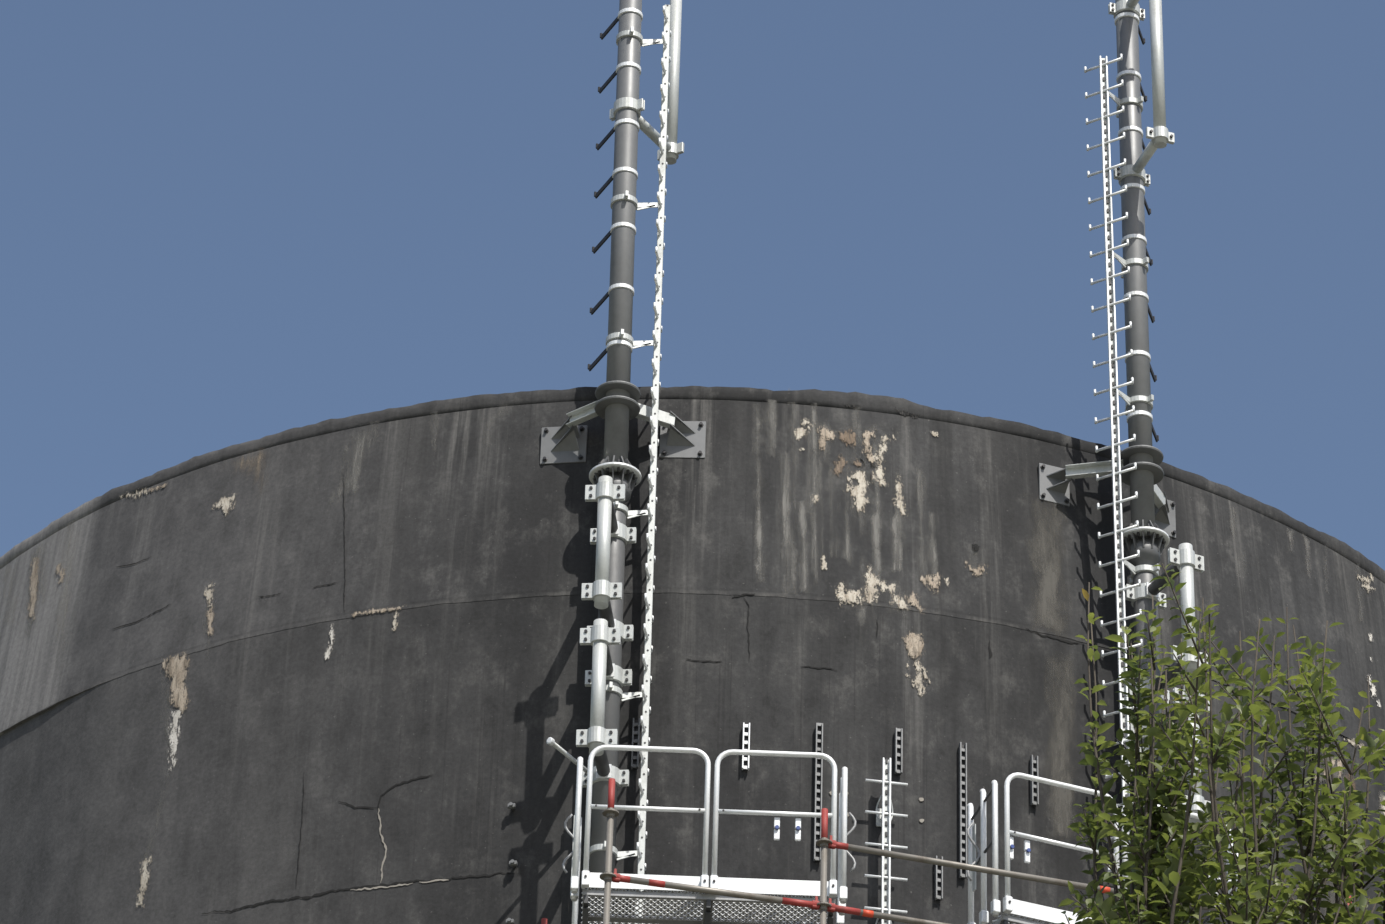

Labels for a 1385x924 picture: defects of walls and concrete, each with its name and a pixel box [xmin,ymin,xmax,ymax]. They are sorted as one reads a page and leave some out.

peeling [211,495,236,515]
peeling [794,418,908,528]
peeling [26,554,66,628]
peeling [204,583,215,635]
peeling [834,564,949,617]
spalling [901,631,931,697]
spalling [161,651,190,770]
spalling [136,856,152,907]